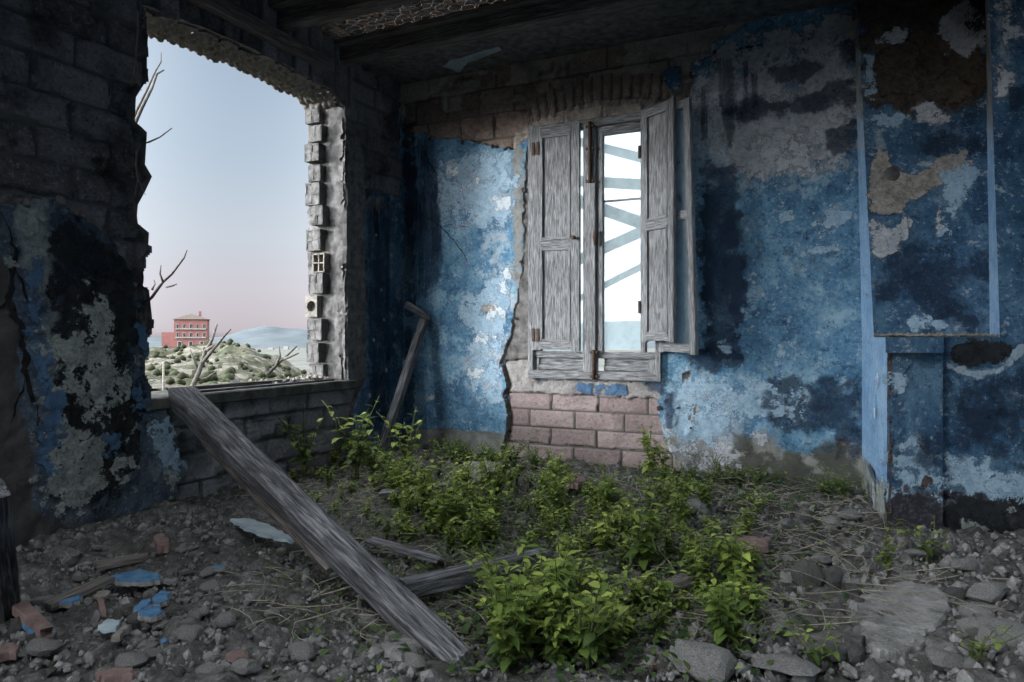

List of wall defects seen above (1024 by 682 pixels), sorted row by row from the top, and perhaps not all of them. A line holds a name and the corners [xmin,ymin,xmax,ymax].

peeling [18,254,68,478]
flaking render [398,12,860,472]
water stain [644,160,862,476]
spalling [866,148,981,259]
water stain [943,344,1024,534]